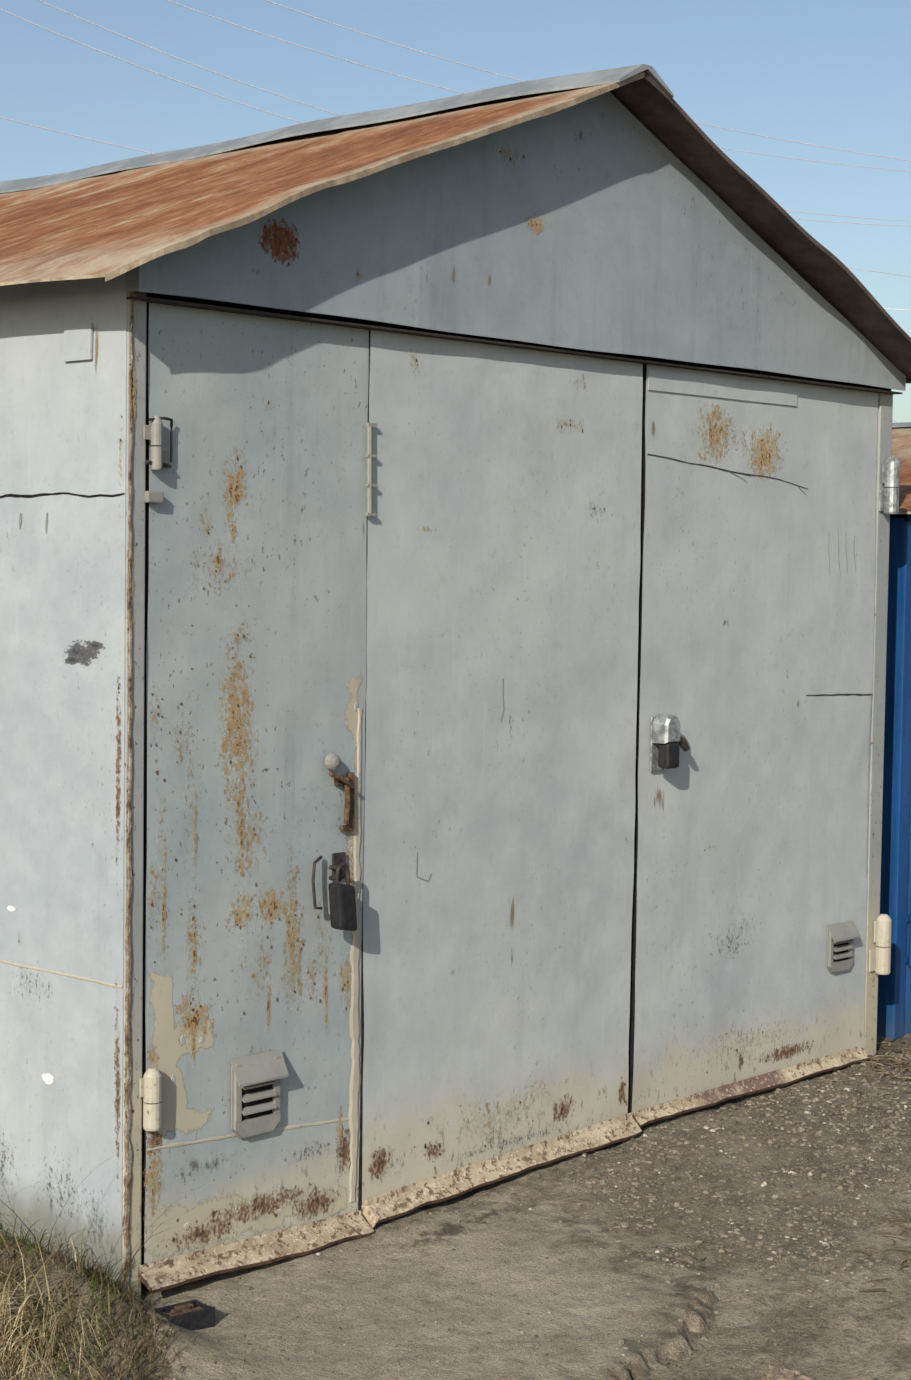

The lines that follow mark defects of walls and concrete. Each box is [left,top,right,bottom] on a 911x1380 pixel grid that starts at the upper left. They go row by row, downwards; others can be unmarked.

crack [0,492,124,533]
crack [648,454,807,495]
water stain [65,641,105,665]
rust [115,518,134,885]
rust [215,620,273,876]
rust [146,694,214,1059]
rust [226,865,352,1029]
peeling [149,973,214,1137]
rust [158,1107,351,1251]
rust [368,1146,391,1179]
rust [414,1083,573,1162]
rust [707,1022,814,1073]